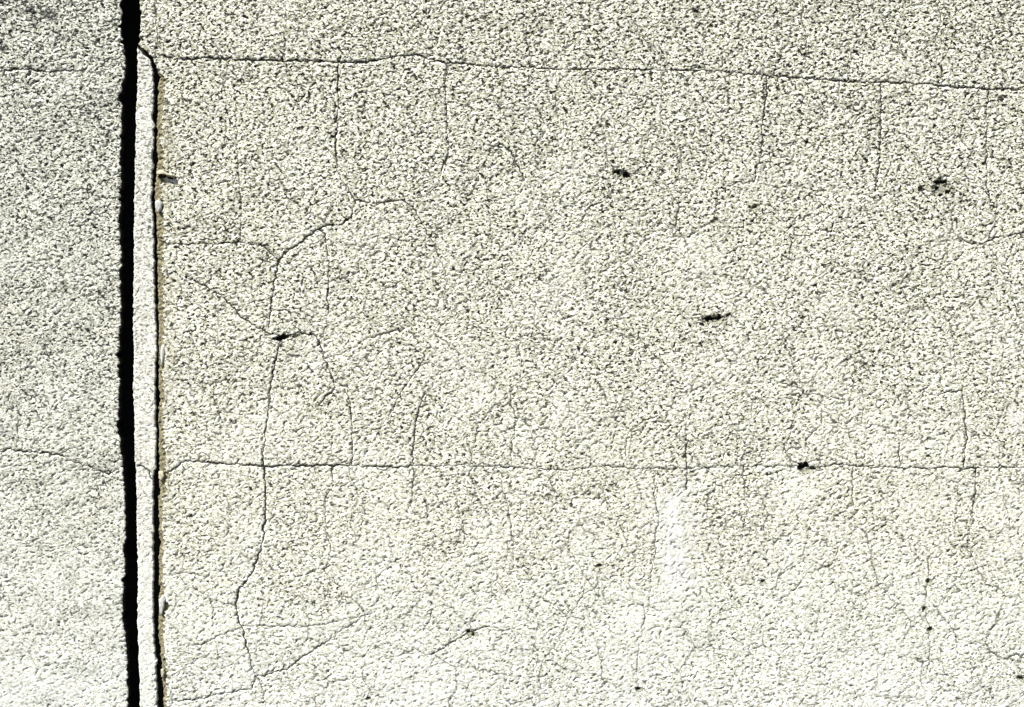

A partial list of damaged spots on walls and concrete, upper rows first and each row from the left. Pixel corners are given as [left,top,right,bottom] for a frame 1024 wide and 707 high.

crack [654,178,683,238]
crack [673,54,1024,245]
crack [0,402,119,475]
crack [138,1,669,707]
crack [456,393,792,594]
crack [777,381,847,448]
crack [809,386,1024,520]